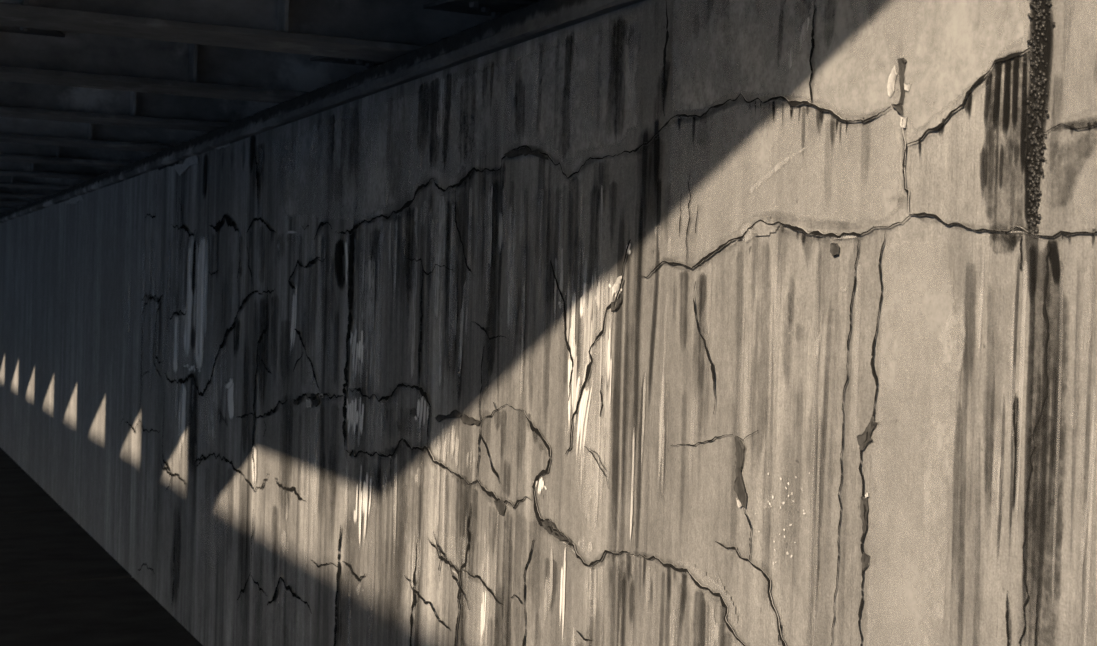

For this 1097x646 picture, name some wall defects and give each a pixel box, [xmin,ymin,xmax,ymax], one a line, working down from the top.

crack [126,395,188,497]
leakage [140,238,297,483]
leakage [411,549,419,646]
leakage [274,21,661,542]
leakage [435,426,510,646]
crack [138,2,891,646]
leakage [545,549,575,646]
leakage [667,567,724,646]
leakage [662,0,1067,611]
crack [639,48,1097,646]